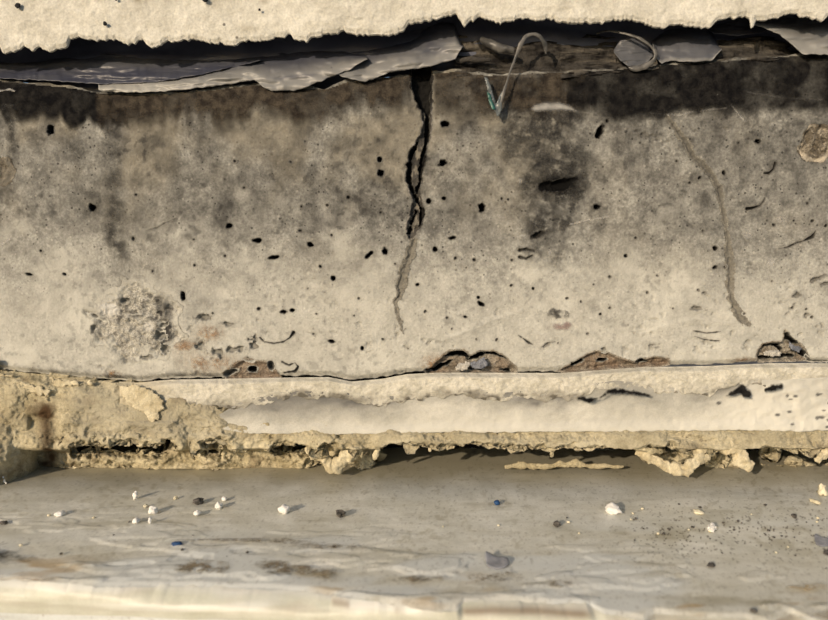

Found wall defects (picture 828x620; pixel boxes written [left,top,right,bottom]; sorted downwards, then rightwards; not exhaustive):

leakage [0,75,410,151]
leakage [435,55,828,234]
crack [392,66,434,334]
spalling [81,275,282,379]
spalling [425,349,518,373]
spalling [556,341,670,373]
spalling [756,329,810,363]
peeling [0,373,93,401]
peeling [120,383,165,422]